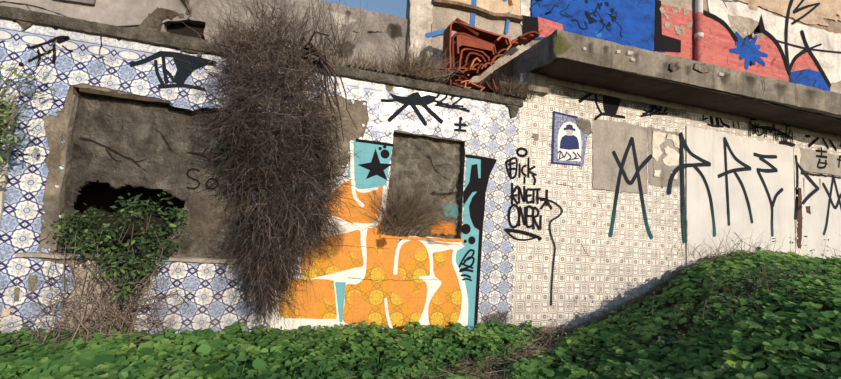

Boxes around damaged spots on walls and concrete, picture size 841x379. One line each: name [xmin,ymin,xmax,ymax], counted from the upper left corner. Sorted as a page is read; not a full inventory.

peeling [728,1,765,39]
peeling [37,112,65,253]